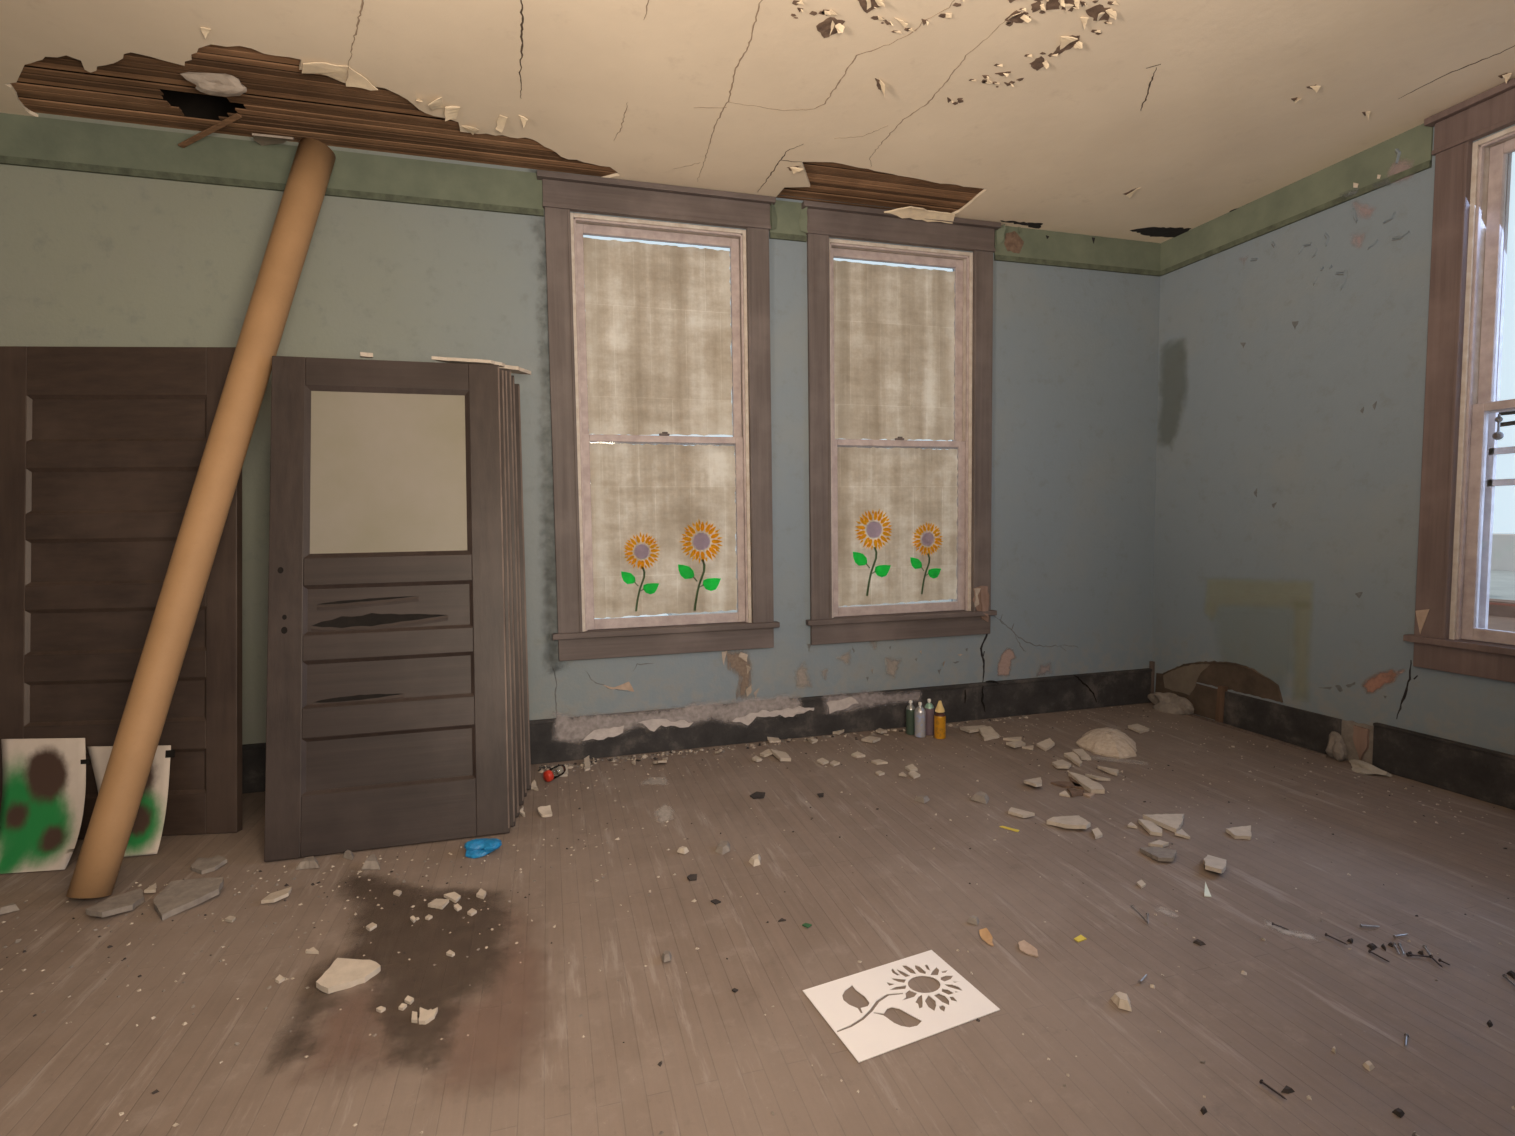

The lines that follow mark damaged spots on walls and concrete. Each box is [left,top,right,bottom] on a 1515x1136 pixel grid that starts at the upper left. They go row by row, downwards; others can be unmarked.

crack [348,0,364,65]
crack [517,0,525,98]
peeling [791,0,845,38]
peeling [858,0,964,34]
peeling [969,0,1119,88]
flaking render [10,27,618,177]
crack [675,0,1005,191]
flaking render [771,162,983,233]
crack [964,614,1097,711]
flaking render [1148,661,1283,723]
water stain [346,876,502,1061]